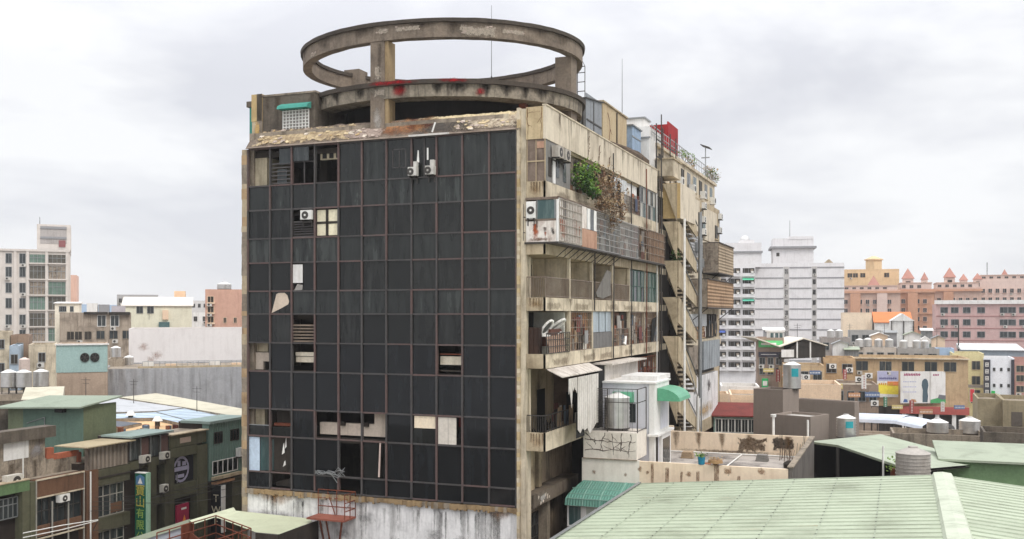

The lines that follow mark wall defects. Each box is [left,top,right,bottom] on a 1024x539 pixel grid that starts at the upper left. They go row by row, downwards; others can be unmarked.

crack [584,432,635,455]
leakage [713,434,794,481]